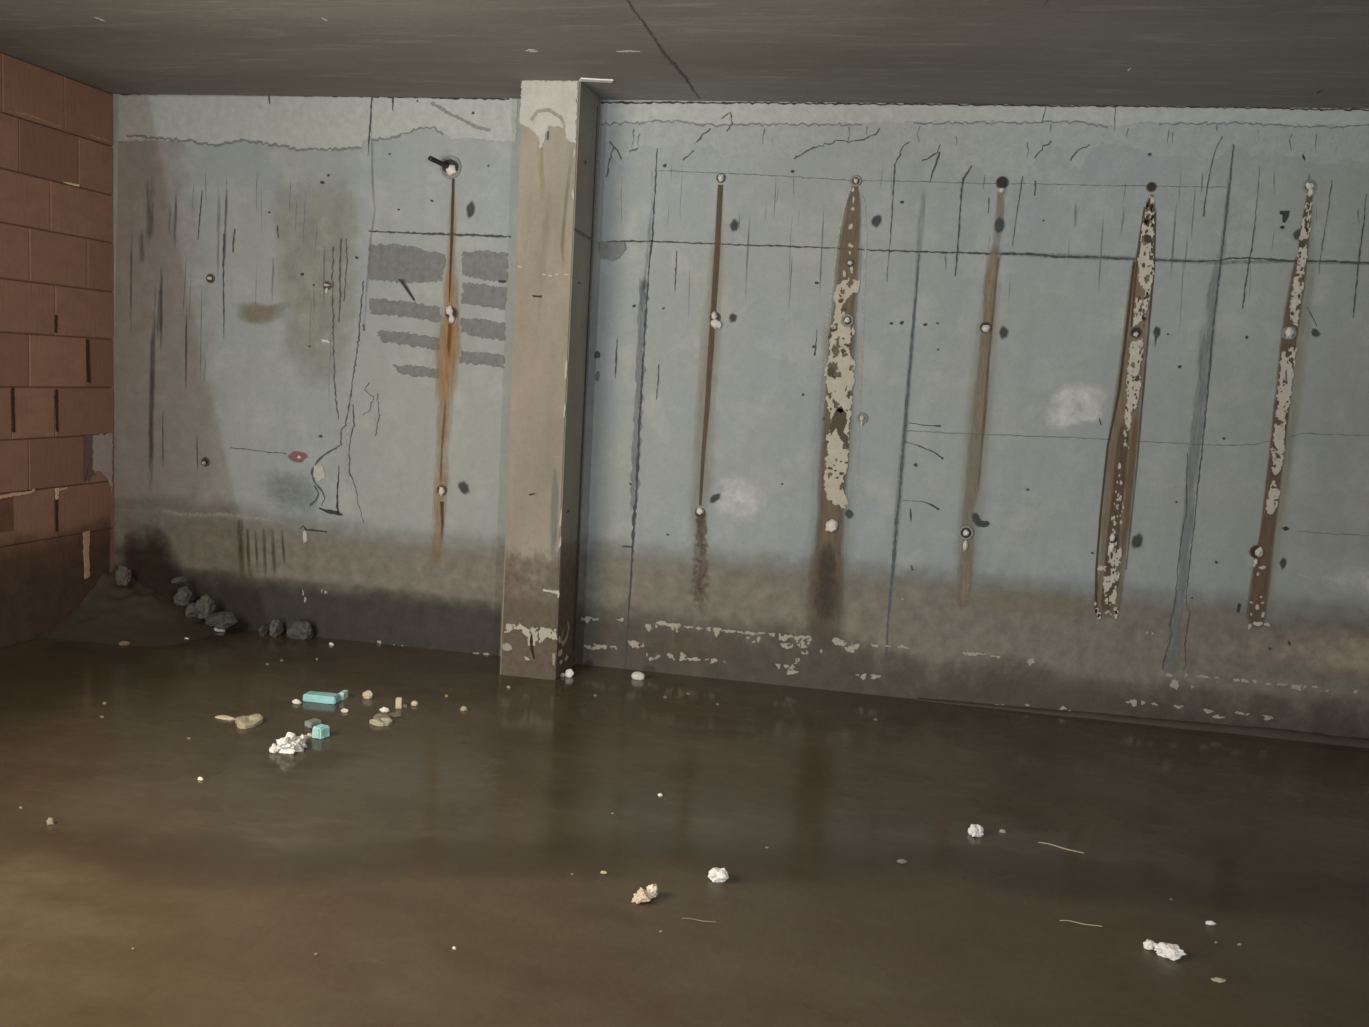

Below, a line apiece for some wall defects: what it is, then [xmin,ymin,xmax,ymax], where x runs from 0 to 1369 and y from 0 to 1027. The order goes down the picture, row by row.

flaking render [519,80,578,180]
crack [230,230,511,543]
corrosion [436,179,459,540]
corrosion [696,185,723,600]
corrosion [812,185,867,629]
crack [573,0,1369,695]
corrosion [967,192,1003,506]
corrosion [1094,194,1156,619]
corrosion [1248,195,1313,630]
crack [527,634,535,660]
damp [0,483,1369,738]